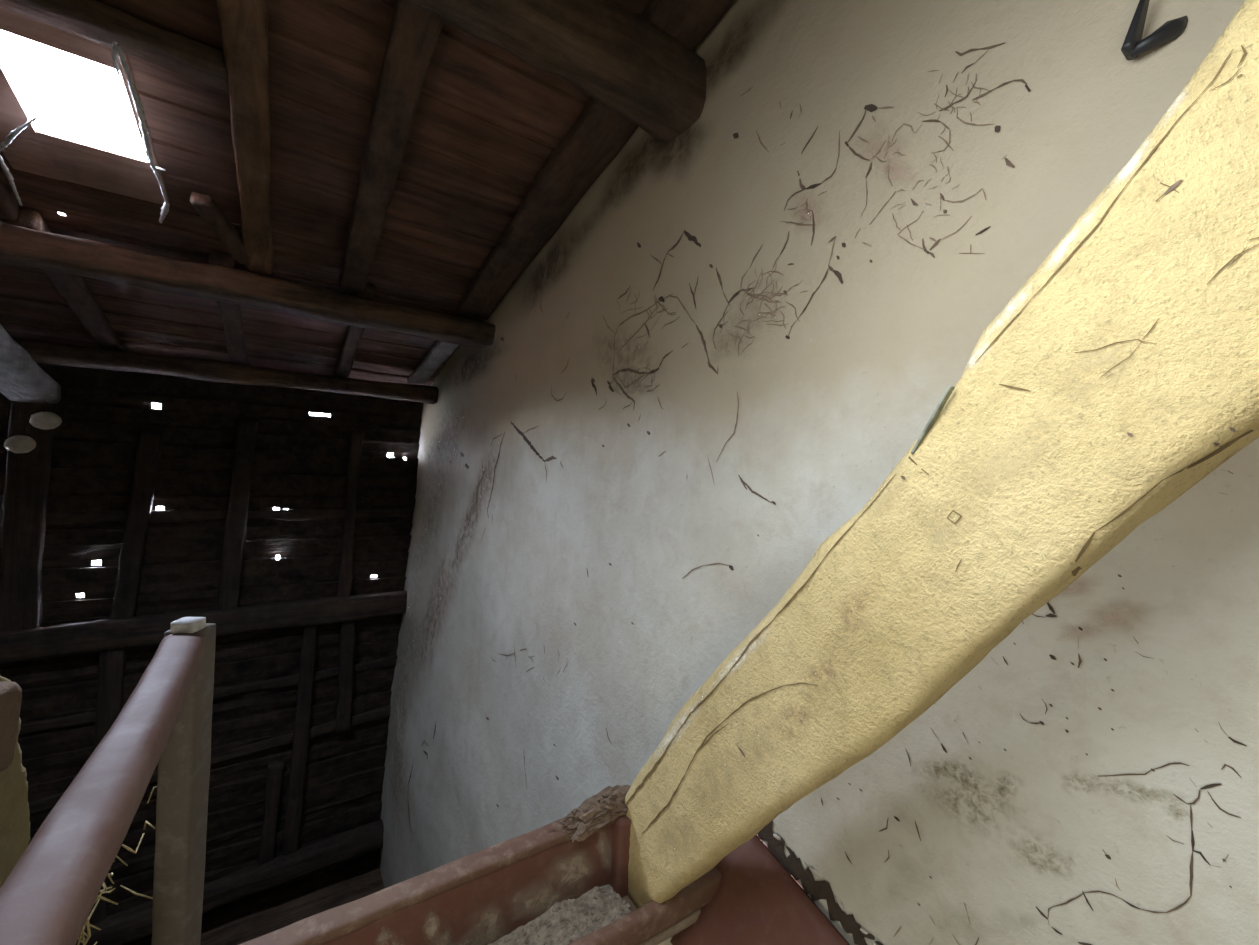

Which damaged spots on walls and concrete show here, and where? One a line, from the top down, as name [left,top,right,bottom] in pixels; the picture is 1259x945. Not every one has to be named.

crack [551,42,1031,505]
crack [441,422,564,578]
crack [1072,427,1254,576]
crack [490,648,567,681]
crack [625,474,896,834]
crack [1003,602,1151,731]
spalling [757,820,883,945]
crack [879,816,921,863]
crack [1020,701,1247,945]